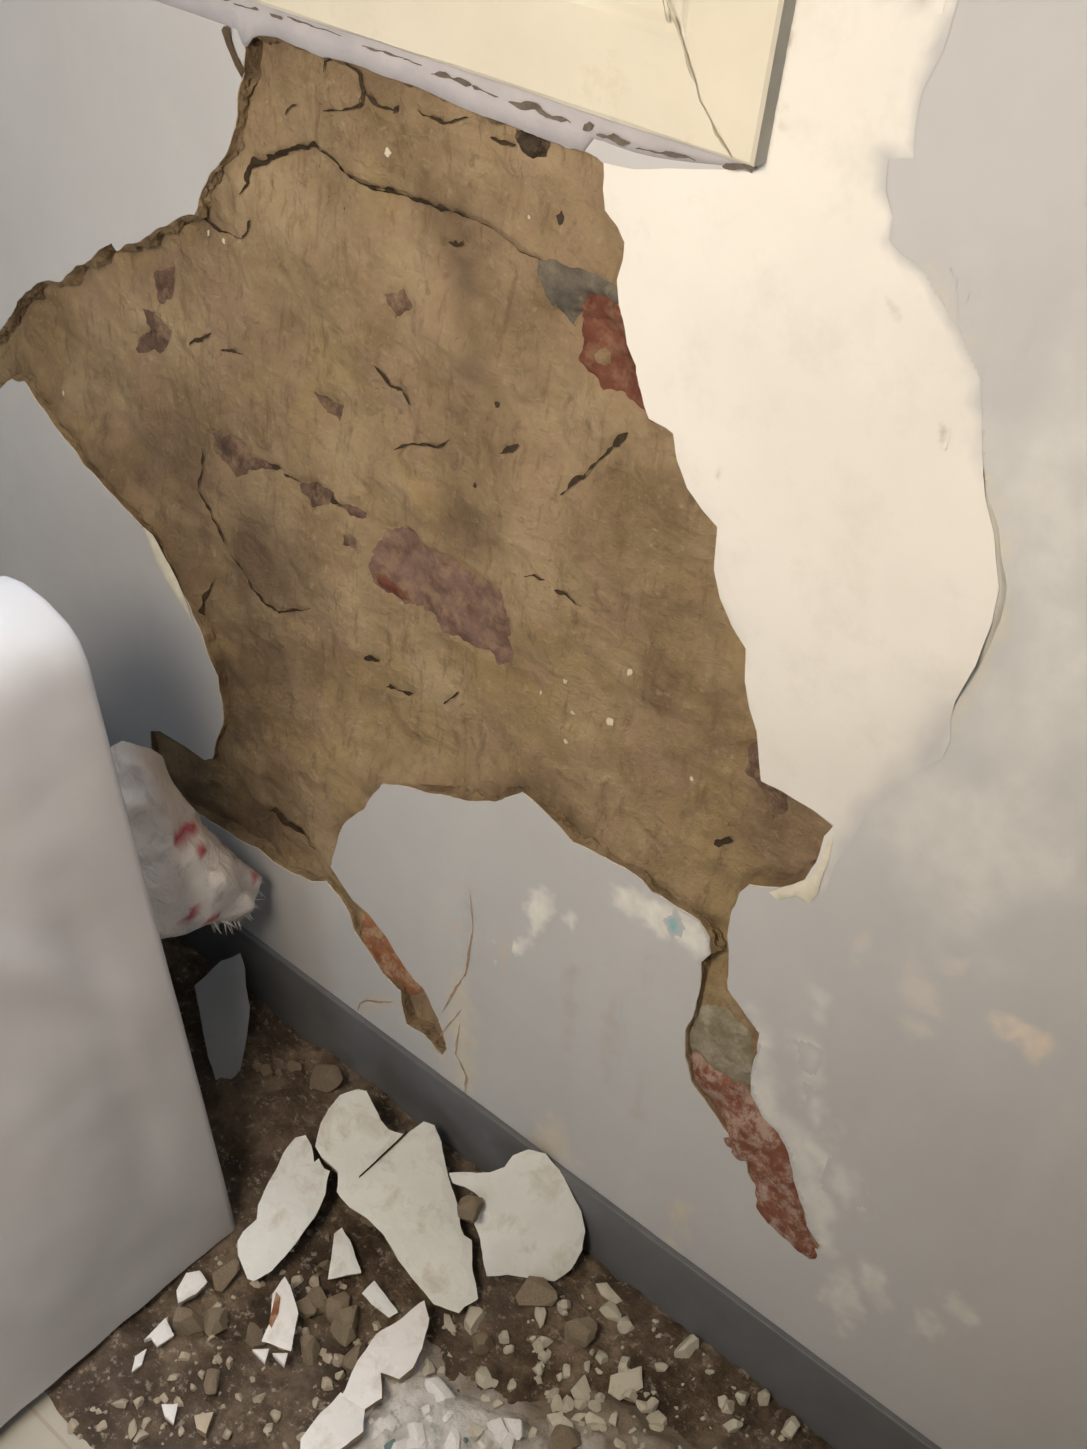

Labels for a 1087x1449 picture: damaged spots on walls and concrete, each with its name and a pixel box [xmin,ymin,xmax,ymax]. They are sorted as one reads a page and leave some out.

crack [184,0,757,259]
spalling [0,0,1007,1136]
corrosion [354,987,401,1023]
crack [358,897,473,1093]
corrosion [427,973,453,1084]